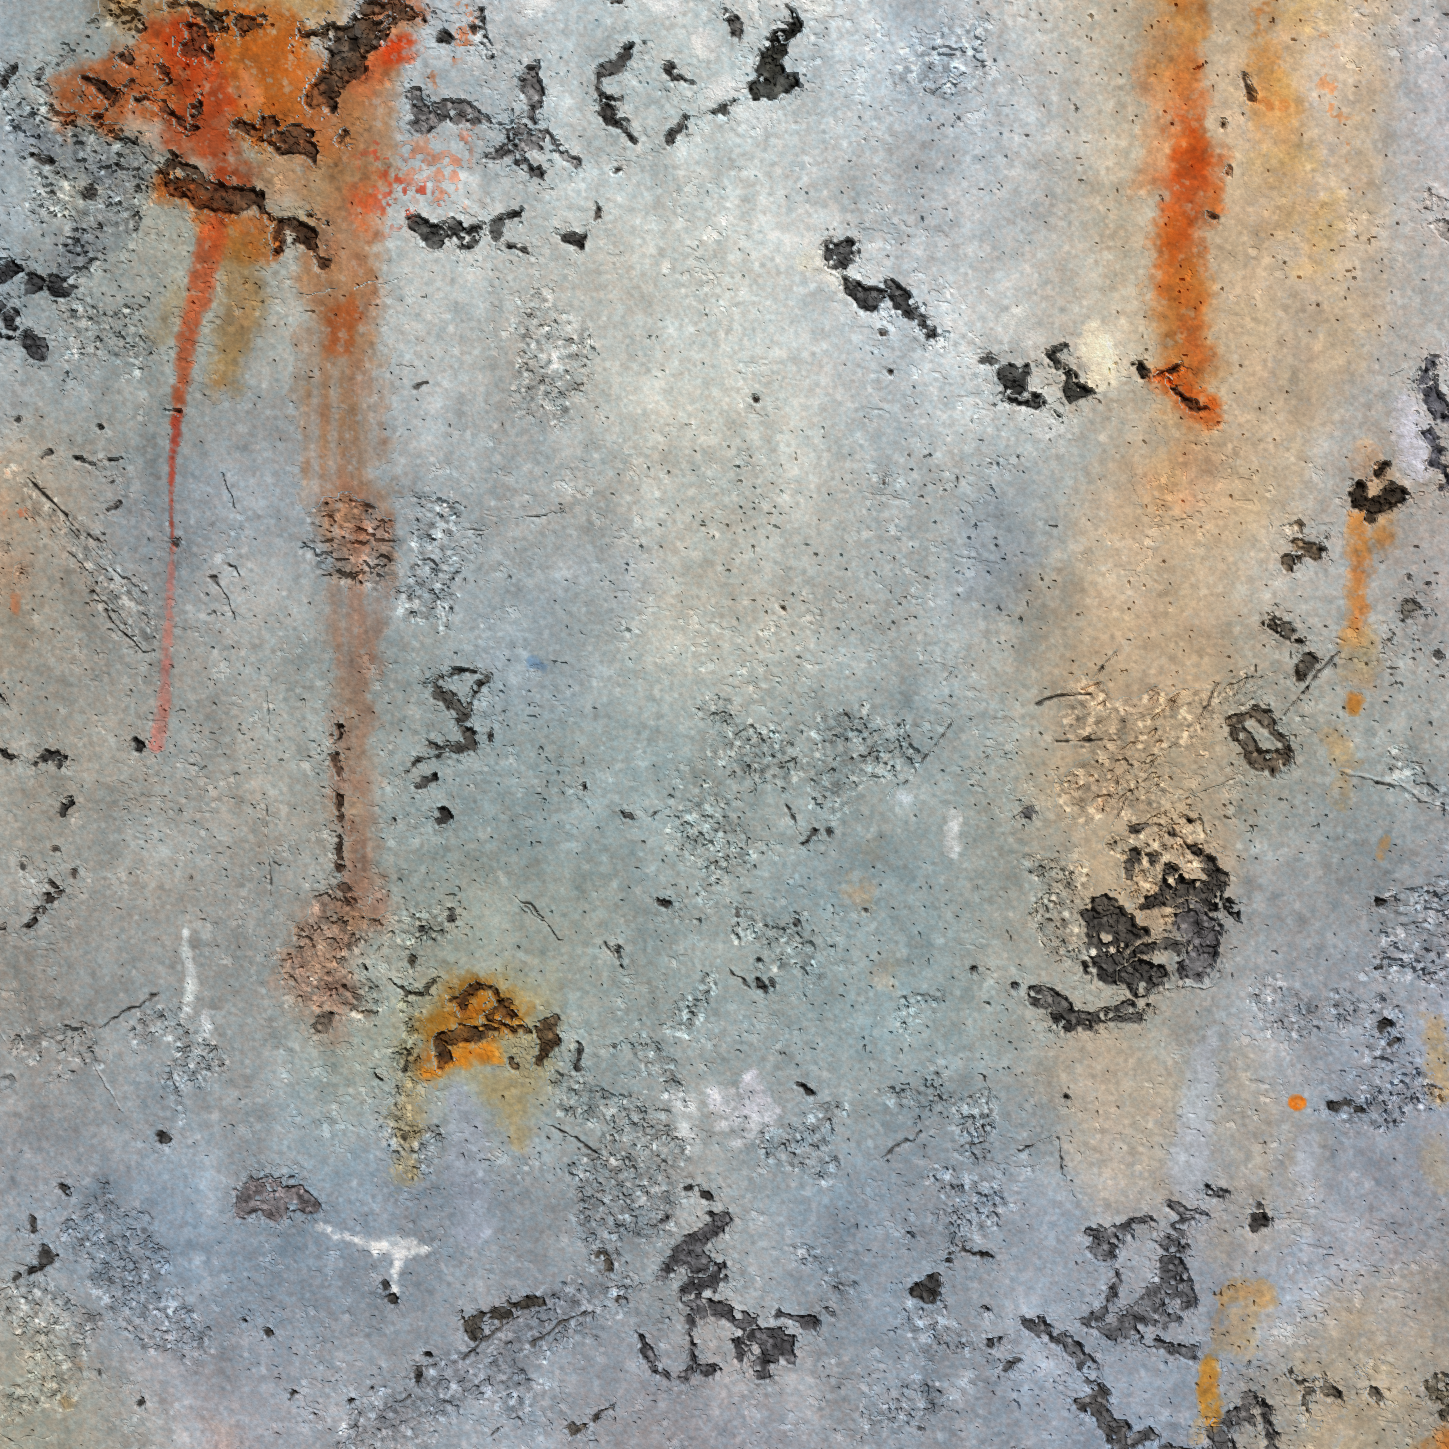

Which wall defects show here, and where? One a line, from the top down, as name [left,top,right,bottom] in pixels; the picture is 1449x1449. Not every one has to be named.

peeling [0,0,334,370]
rust [44,0,487,754]
spalling [230,0,583,185]
spalling [821,232,953,351]
spalling [977,343,1102,425]
rust [1123,0,1363,524]
rust [261,554,405,1057]
rust [414,966,538,1090]
spalling [1009,808,1241,1048]
spalling [634,1180,862,1395]
spalling [860,1071,1282,1449]
rust [1404,1423,1449,1449]